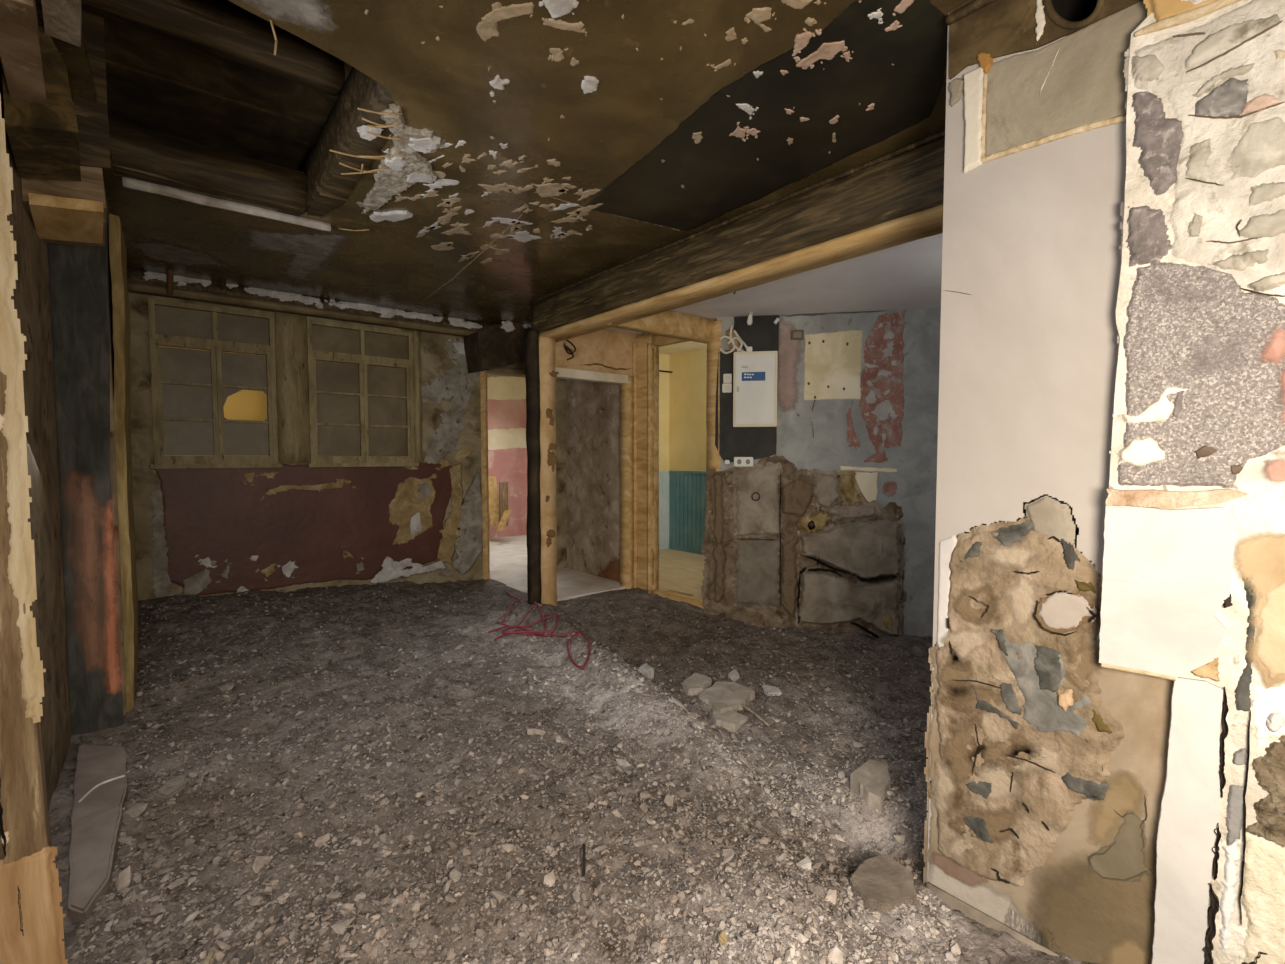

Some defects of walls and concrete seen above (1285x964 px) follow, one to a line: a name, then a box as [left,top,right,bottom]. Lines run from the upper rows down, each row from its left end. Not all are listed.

water stain [251,0,333,27]
peeling [539,0,579,21]
peeling [725,0,853,76]
peeling [729,103,760,142]
peeling [369,136,603,265]
flaking render [949,0,1285,488]
peeling [143,271,483,598]
flaking render [702,310,907,636]
rust [68,474,121,693]
crack [740,477,897,624]
crack [1033,590,1096,636]
flaking render [922,494,1173,950]